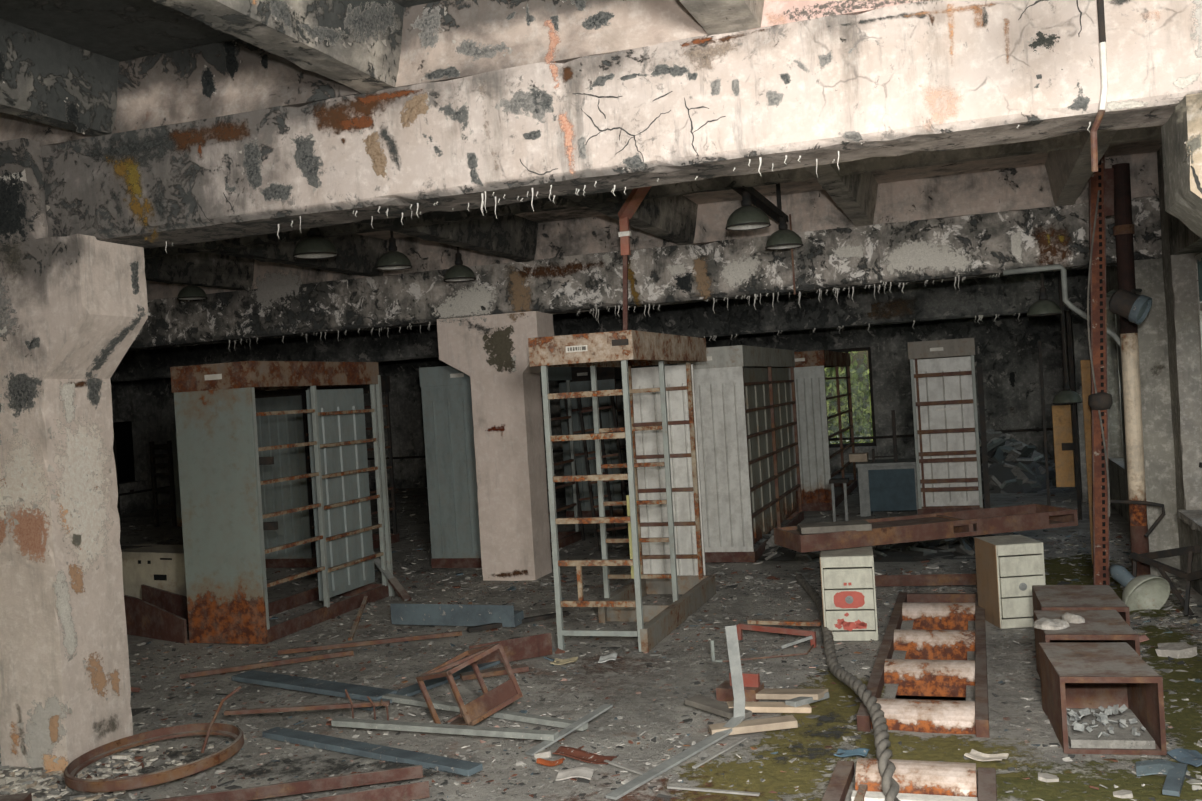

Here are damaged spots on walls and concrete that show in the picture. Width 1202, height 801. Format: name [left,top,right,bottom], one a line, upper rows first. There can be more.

spalling [506,0,615,36]
crack [1018,0,1082,35]
rust [545,20,573,88]
rust [170,122,250,158]
rust [313,89,422,144]
rust [558,112,576,174]
crack [520,91,726,175]
spalling [0,169,50,244]
leakage [628,260,641,305]
leakage [460,261,605,372]
peeling [0,261,150,593]
peeling [83,652,120,700]